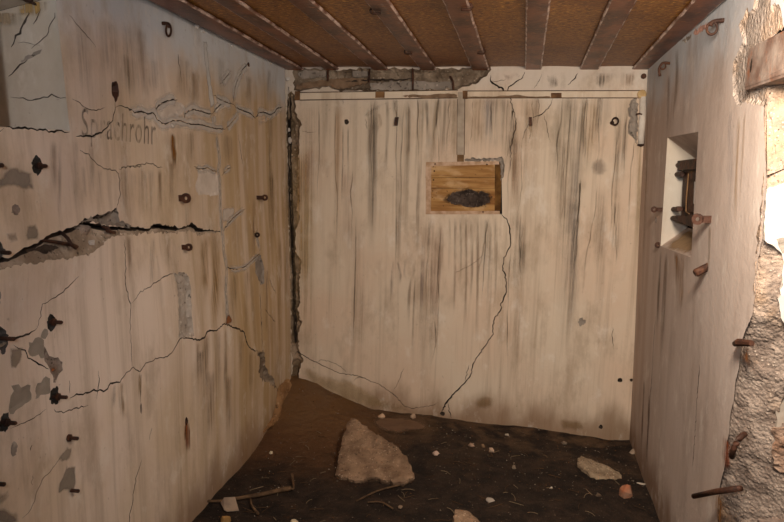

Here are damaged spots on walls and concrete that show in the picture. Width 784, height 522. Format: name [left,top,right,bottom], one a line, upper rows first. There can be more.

crack [9,0,96,76]
spalling [732,0,784,107]
spalling [195,170,219,197]
crack [0,55,511,427]
spalling [286,67,491,377]
spalling [173,272,194,339]
spalling [770,427,784,473]